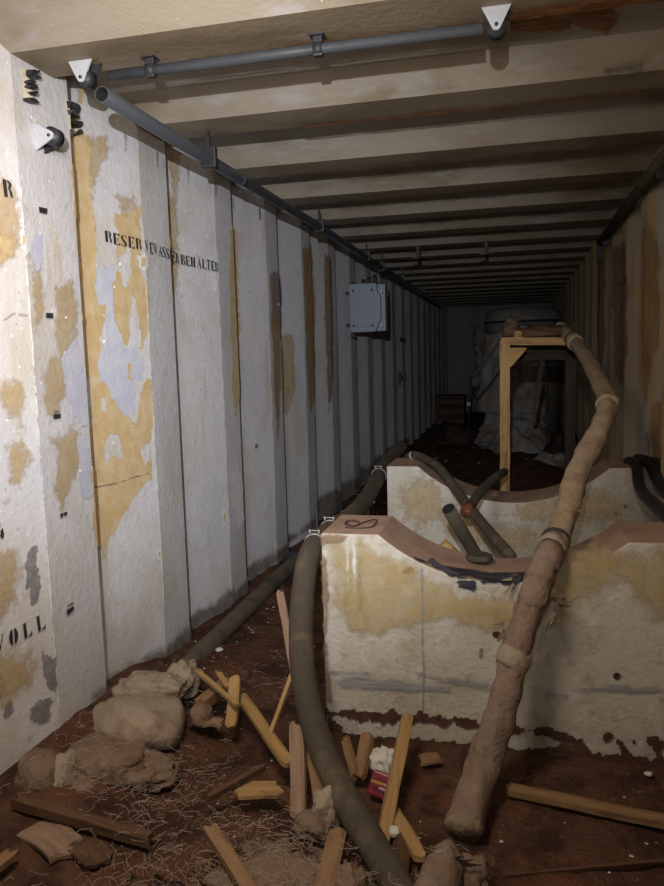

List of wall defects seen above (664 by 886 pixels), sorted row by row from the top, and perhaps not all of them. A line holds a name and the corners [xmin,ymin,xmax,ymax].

rust [507,0,663,33]
peeling [0,180,43,459]
peeling [61,87,165,606]
damp [229,226,241,417]
damp [270,275,295,433]
damp [303,246,333,411]
damp [597,244,628,382]
damp [640,228,662,459]
peeling [322,557,480,747]
damp [331,538,515,634]
damp [552,549,664,618]
peeling [507,726,664,768]